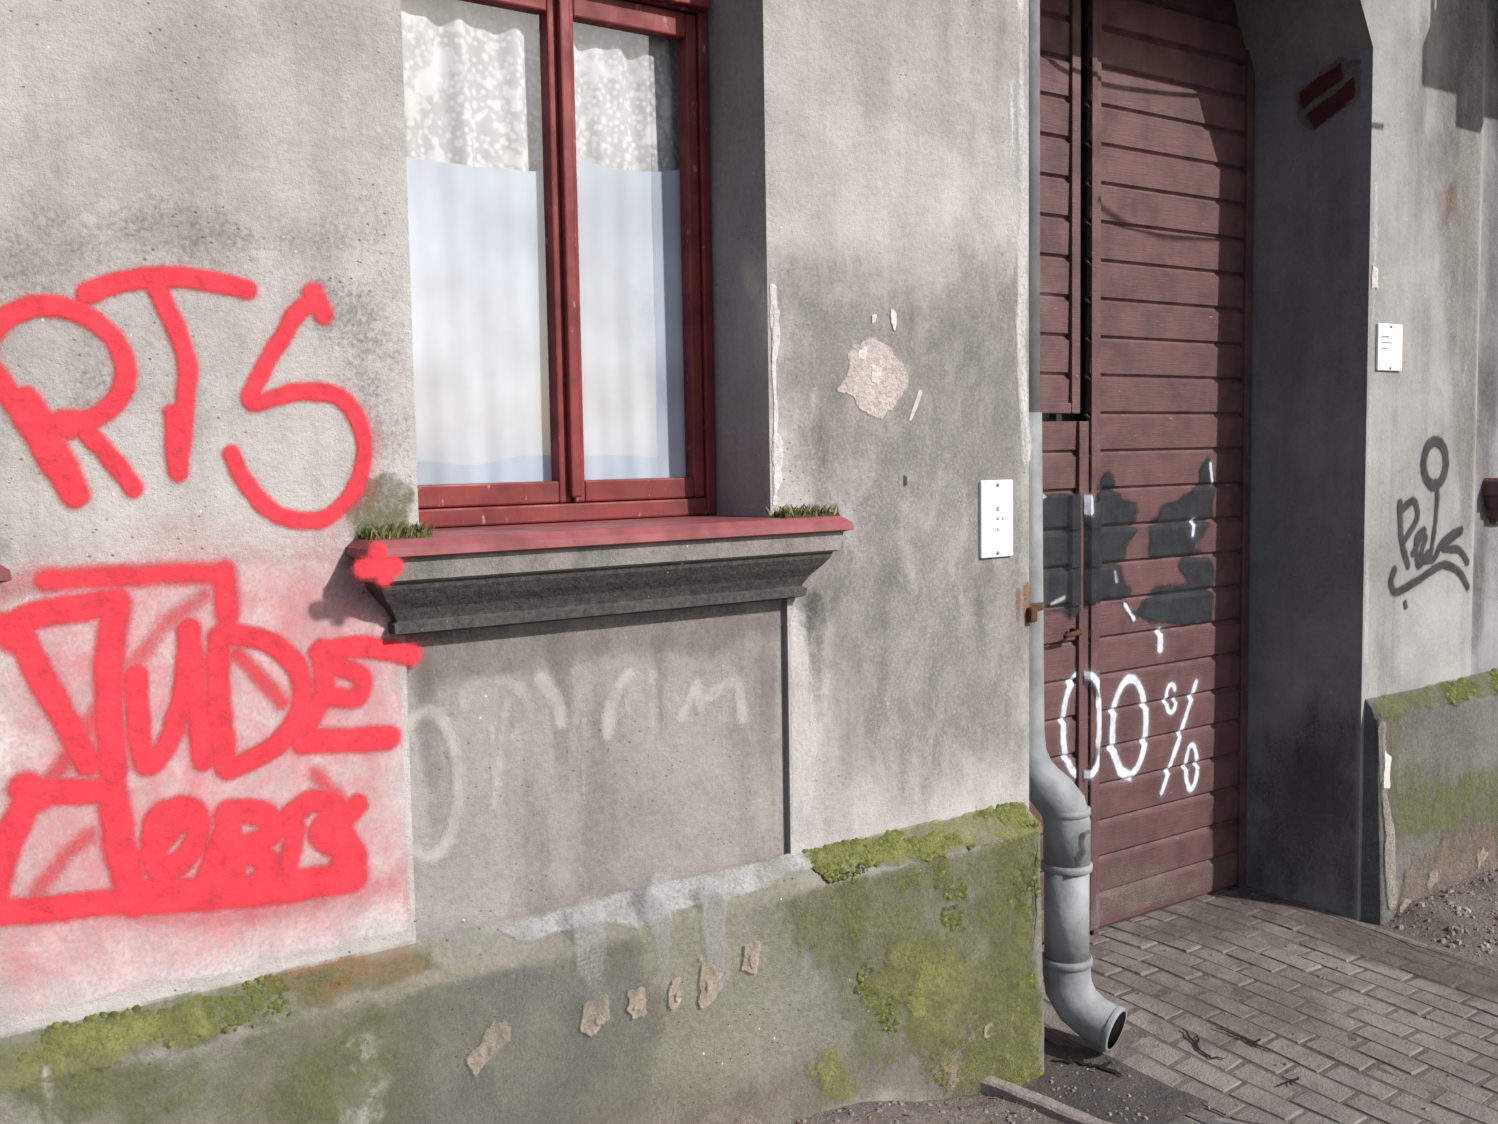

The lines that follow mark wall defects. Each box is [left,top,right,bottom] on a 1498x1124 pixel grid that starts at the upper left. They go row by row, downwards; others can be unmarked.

spalling [837,309,909,419]
spalling [580,1002,610,1036]
spalling [627,987,647,1019]
spalling [669,957,722,1010]
spalling [742,941,761,973]
spalling [467,1021,507,1077]